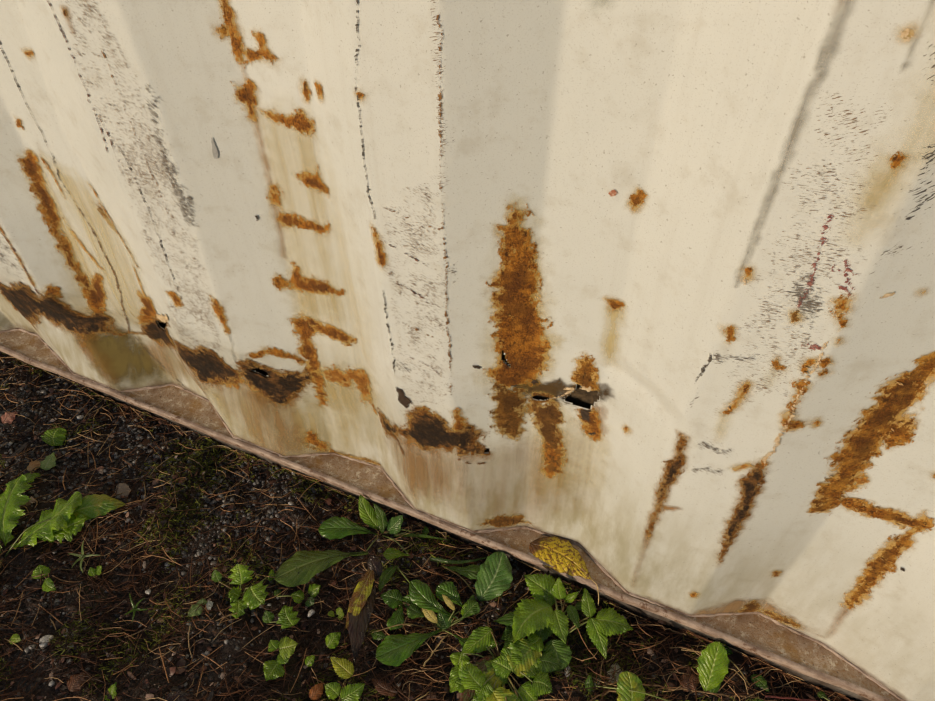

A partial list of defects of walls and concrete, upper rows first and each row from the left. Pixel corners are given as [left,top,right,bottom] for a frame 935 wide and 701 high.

rust [216,0,278,69]
rust [231,79,323,137]
rust [0,149,568,491]
rust [605,299,625,357]
rust [830,295,851,328]
rust [571,353,600,391]
rust [576,407,605,441]
rust [645,433,687,538]
rust [719,339,840,561]
rust [807,352,935,615]